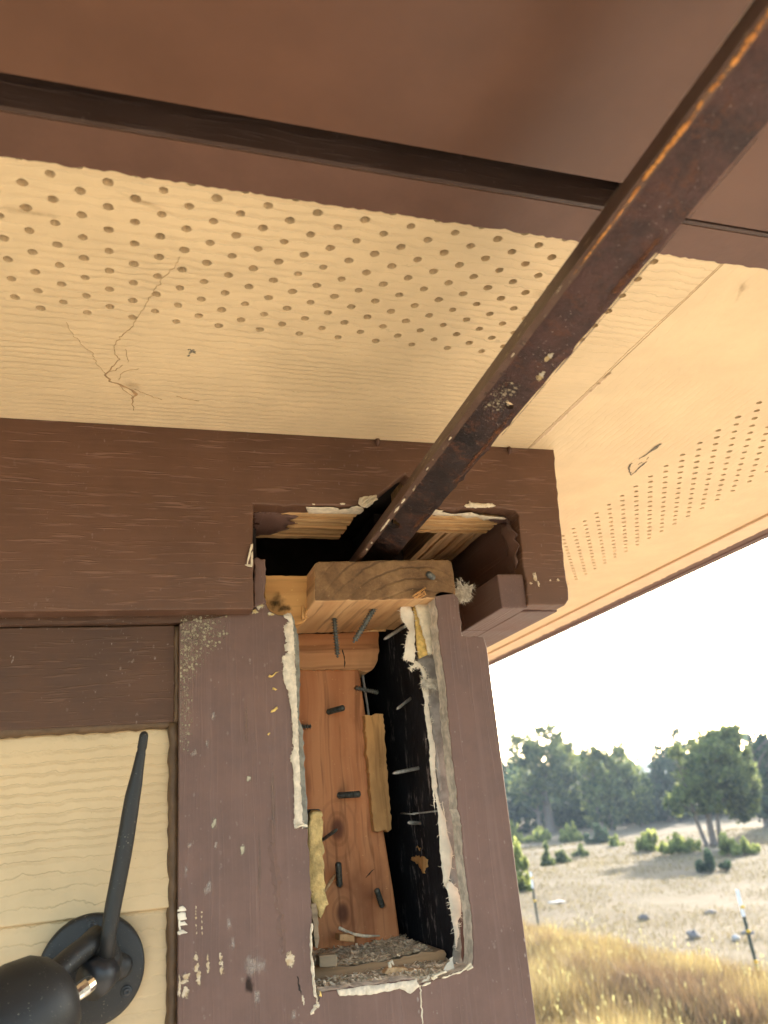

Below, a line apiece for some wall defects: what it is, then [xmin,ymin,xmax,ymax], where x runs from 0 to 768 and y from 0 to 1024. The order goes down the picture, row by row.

rust [573,10,768,275]
crack [66,257,196,410]
peeling [306,495,378,514]
peeling [432,501,506,521]
peeling [268,613,308,829]
peeling [337,962,473,996]